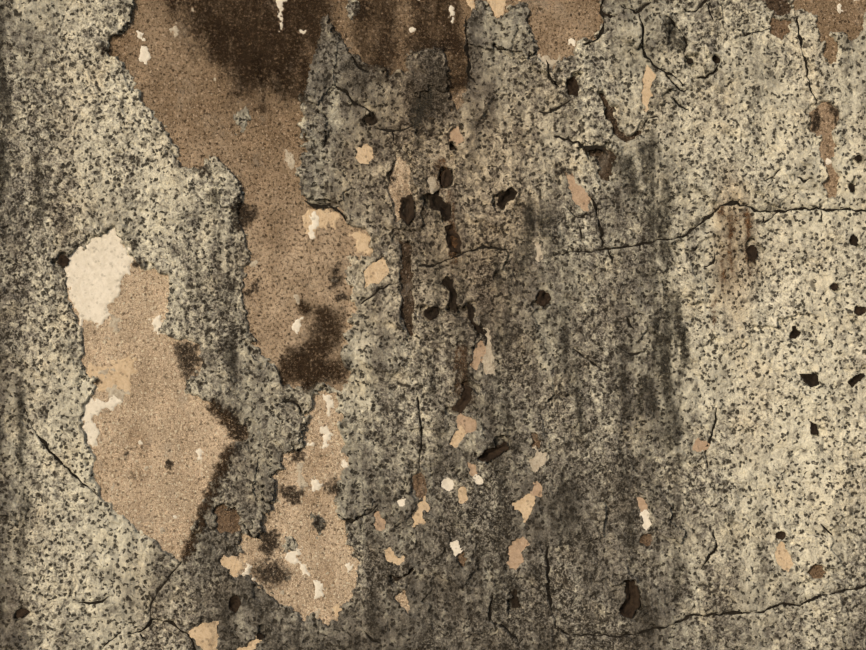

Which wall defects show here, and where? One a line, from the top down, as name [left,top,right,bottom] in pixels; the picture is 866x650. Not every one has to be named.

water stain [169,0,332,100]
water stain [354,0,469,93]
flaking render [763,0,866,64]
spalling [583,147,616,181]
flaking render [809,101,840,198]
crack [557,197,866,265]
water stain [278,299,348,392]
flaking render [58,0,603,625]
crack [24,408,98,496]
crack [101,563,196,650]
crack [545,547,866,638]
crack [701,529,718,569]